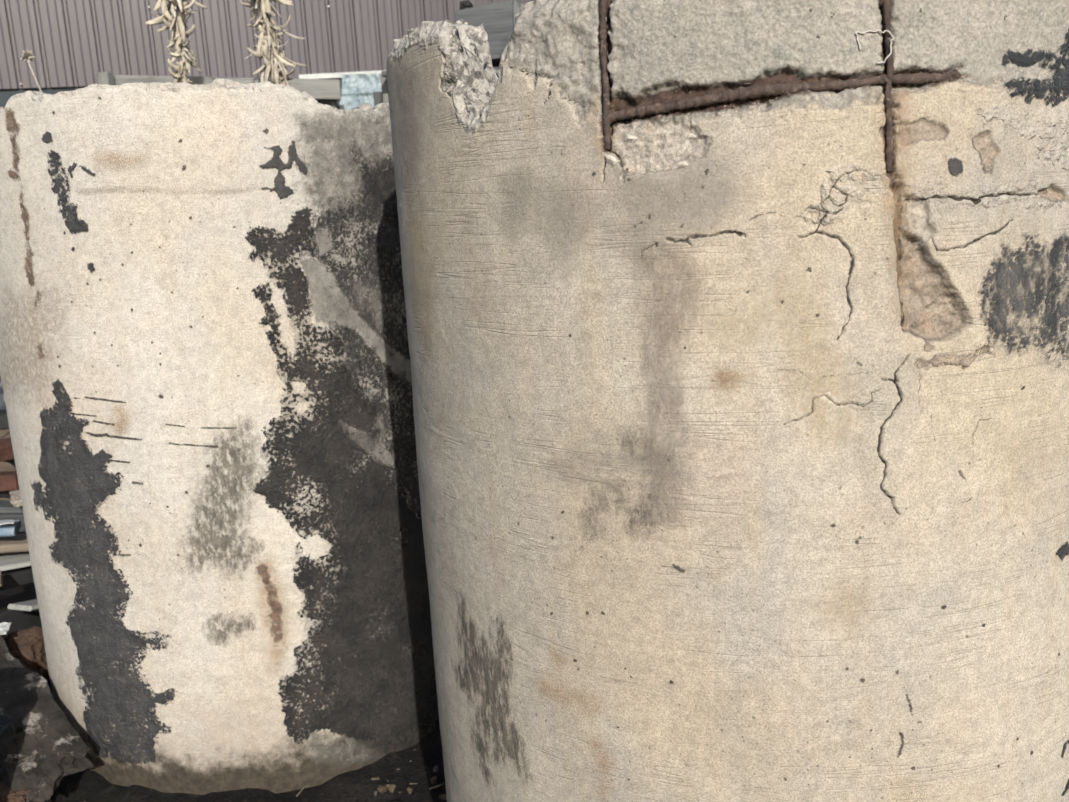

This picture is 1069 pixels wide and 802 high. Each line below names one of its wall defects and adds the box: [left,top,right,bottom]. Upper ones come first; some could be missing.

spalling [444,28,472,95]
spalling [507,0,1069,189]
rust [5,108,20,180]
rust [20,192,41,306]
crack [641,212,776,257]
crack [799,171,881,339]
spalling [897,196,991,368]
crack [904,193,1037,251]
spalling [1037,184,1069,202]
crack [785,358,935,514]
rust [256,564,283,642]